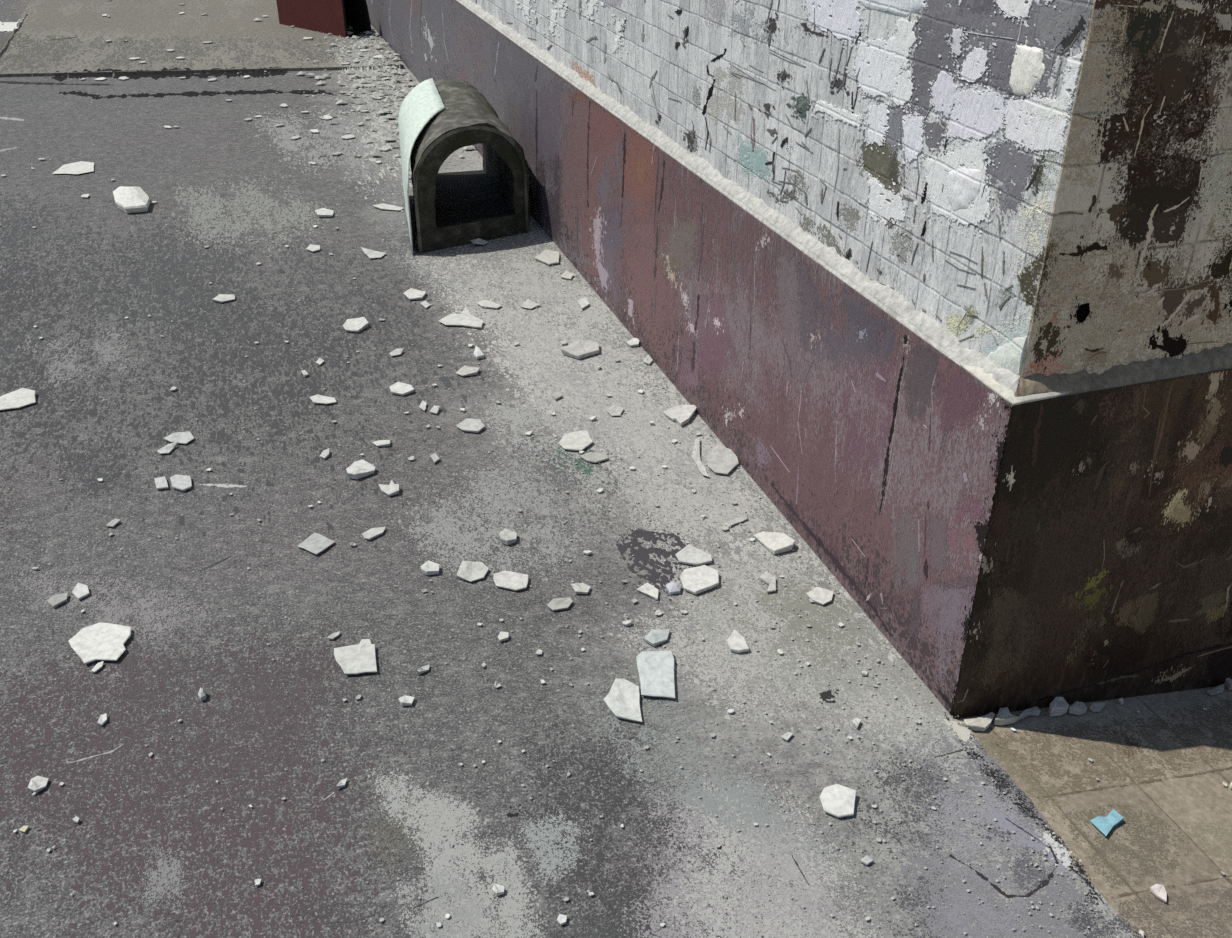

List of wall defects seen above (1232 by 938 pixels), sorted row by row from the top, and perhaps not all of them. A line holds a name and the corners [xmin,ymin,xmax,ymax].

crack [370,0,449,64]
spalling [763,12,779,41]
spalling [794,18,829,38]
spalling [830,69,850,95]
spalling [681,130,702,152]
crack [494,0,1013,381]
peeling [732,70,811,181]
crack [1026,165,1040,190]
peeling [855,0,1232,374]
crack [851,335,937,515]
crack [770,339,893,637]
crack [918,501,929,580]